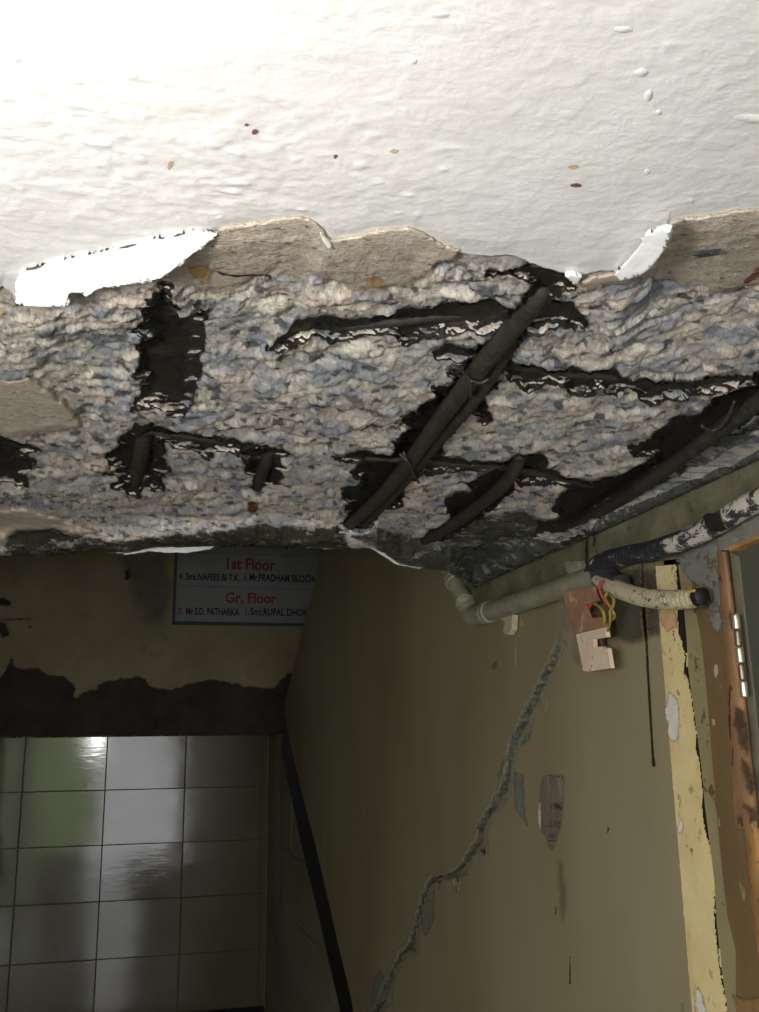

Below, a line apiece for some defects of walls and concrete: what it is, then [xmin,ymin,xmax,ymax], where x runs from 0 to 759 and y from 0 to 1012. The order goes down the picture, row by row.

spalling [0,208,759,633]
peeling [0,658,292,738]
peeling [665,693,679,741]
crack [368,637,565,1012]
peeling [681,989,706,1012]